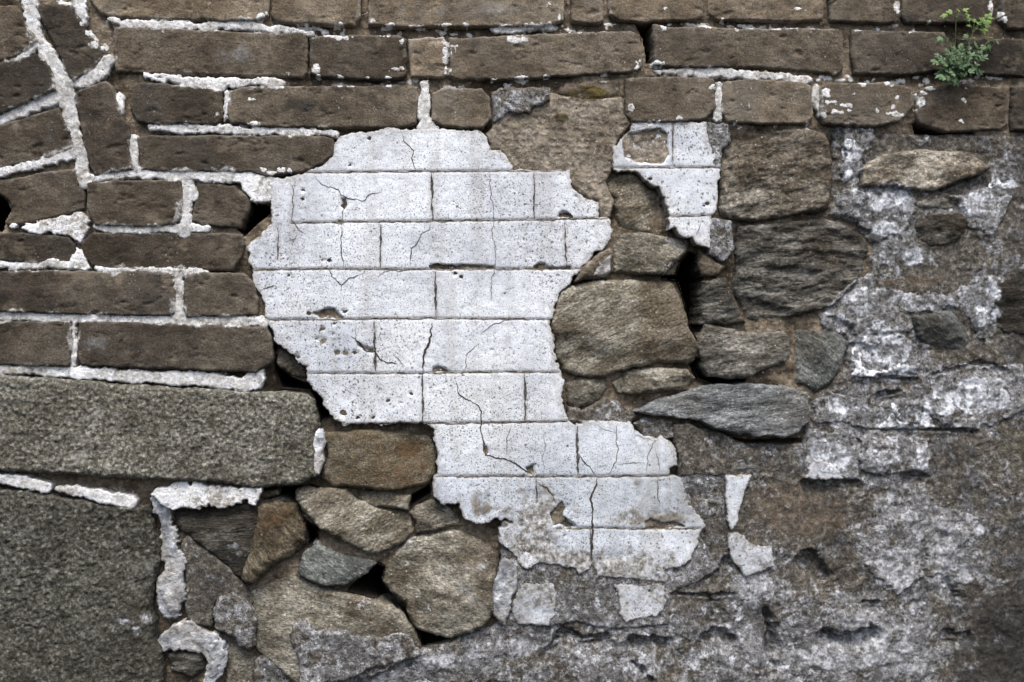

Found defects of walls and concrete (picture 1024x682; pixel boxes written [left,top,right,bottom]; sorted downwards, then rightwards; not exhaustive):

crack [286,177,430,288]
peeling [611,121,721,340]
crack [352,324,433,370]
peeling [238,127,706,626]
crack [456,320,556,503]
spalling [689,356,746,384]
crack [579,423,660,556]